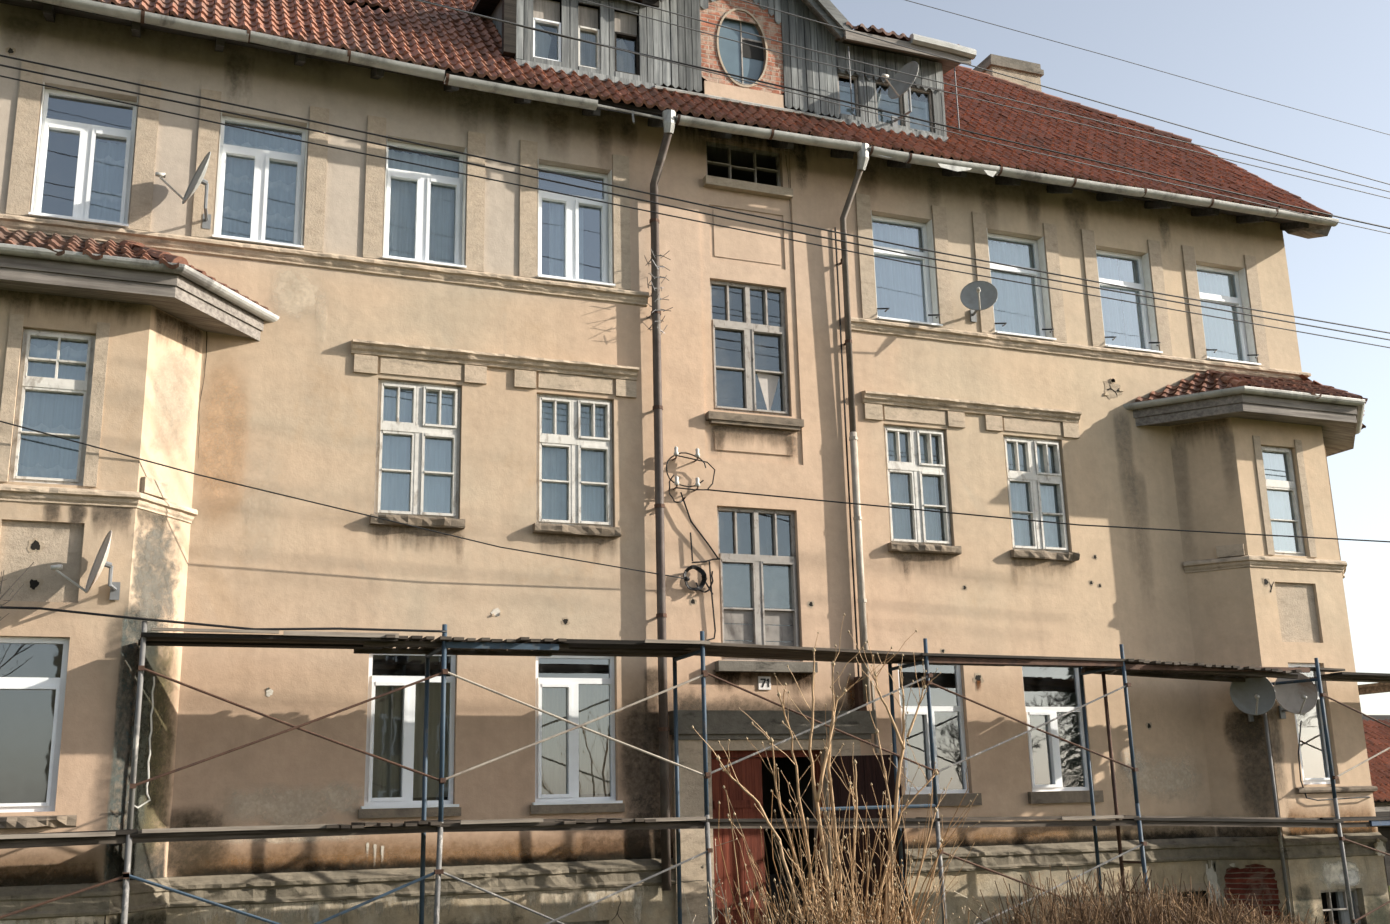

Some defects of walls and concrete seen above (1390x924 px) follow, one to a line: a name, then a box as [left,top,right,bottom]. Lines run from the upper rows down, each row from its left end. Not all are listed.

damp [156,310,201,344]
damp [0,504,654,887]
damp [905,709,1376,849]
flaking render [1163,860,1285,924]